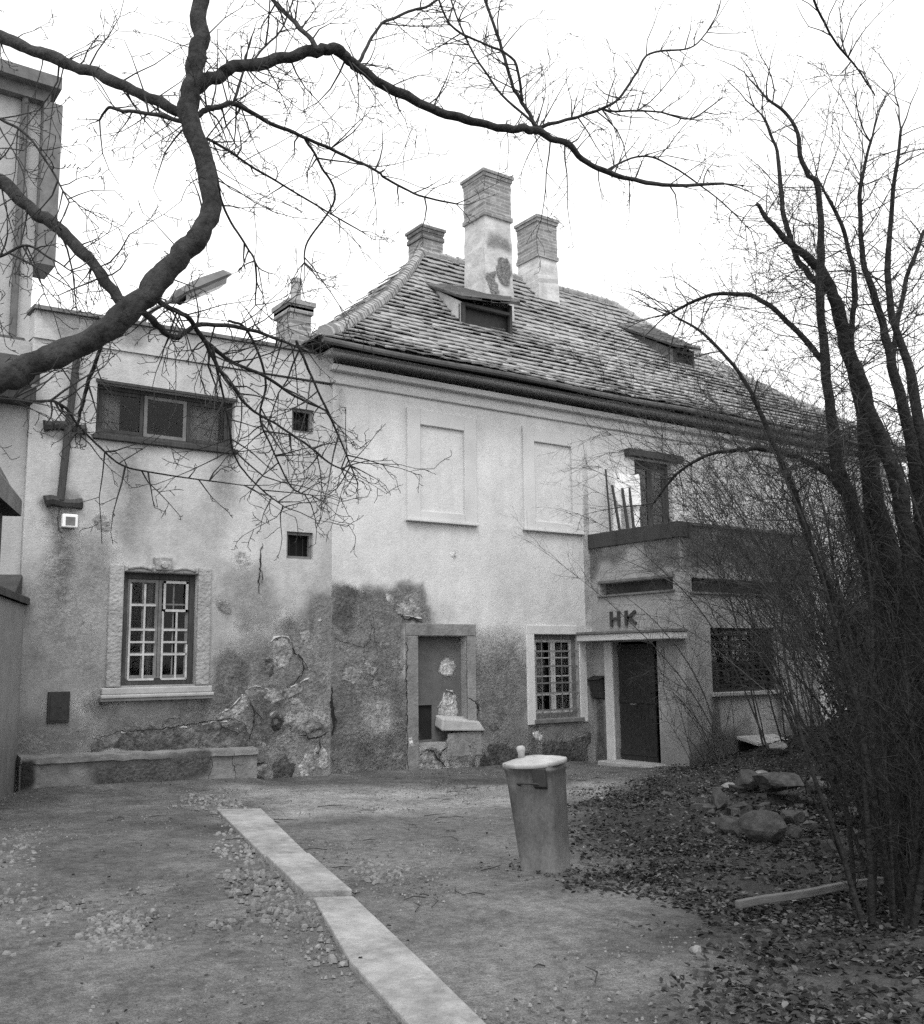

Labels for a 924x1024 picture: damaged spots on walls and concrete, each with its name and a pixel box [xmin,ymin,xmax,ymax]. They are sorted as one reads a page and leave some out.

spalling [486,257,512,294]
crack [256,543,264,589]
peeling [385,592,422,620]
damp [94,584,431,784]
crack [290,644,308,685]
peeling [437,658,458,716]
crack [98,699,268,779]
peeling [91,659,329,778]
crack [299,687,337,753]